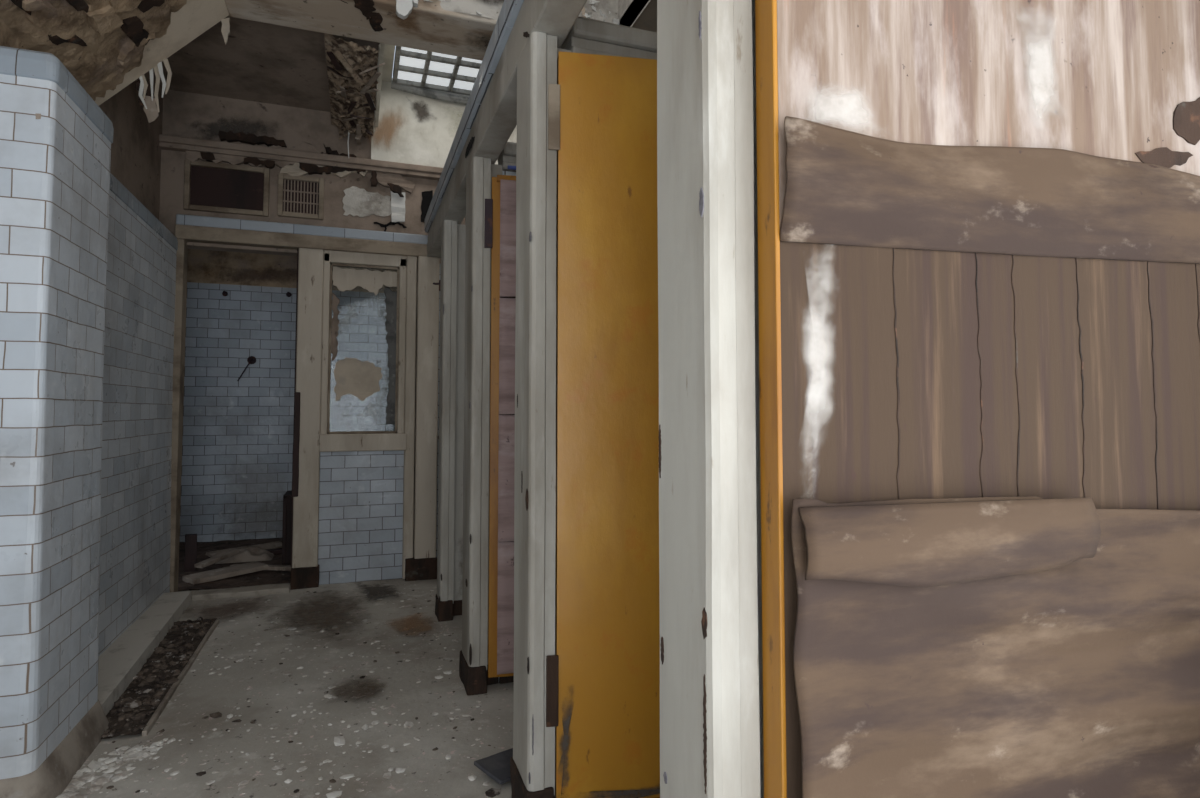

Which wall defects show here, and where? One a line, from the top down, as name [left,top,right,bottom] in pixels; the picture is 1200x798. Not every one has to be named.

spalling [353,0,451,32]
peeling [579,0,619,24]
spalling [0,0,187,101]
spalling [185,130,433,223]
peeling [331,266,397,424]
water stain [277,584,398,640]
water stain [334,679,384,700]